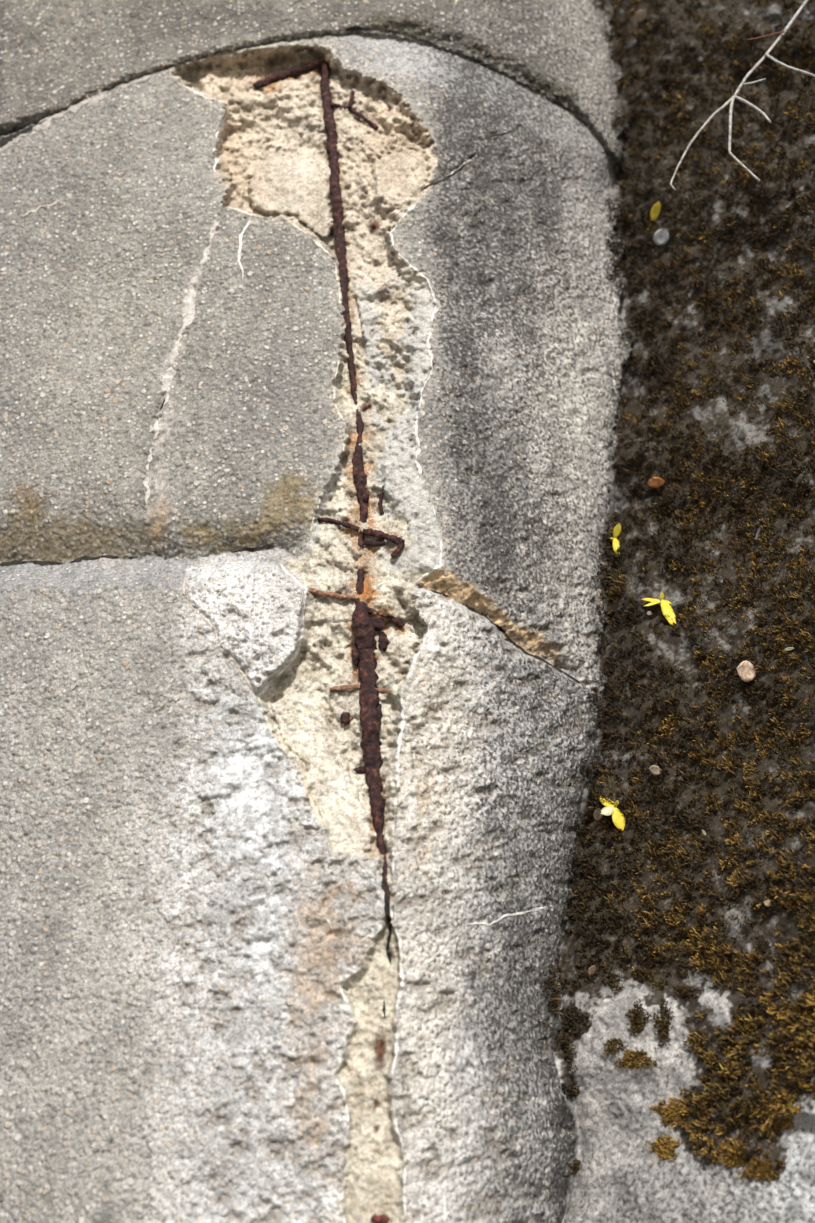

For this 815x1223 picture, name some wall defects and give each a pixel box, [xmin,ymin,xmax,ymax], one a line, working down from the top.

crack [421,129,517,191]
damp [0,267,206,562]
crack [143,216,251,504]
spalling [0,43,445,1223]
damp [182,476,316,553]
rust [340,711,351,726]
rust [340,431,406,675]
rust [282,882,364,1025]